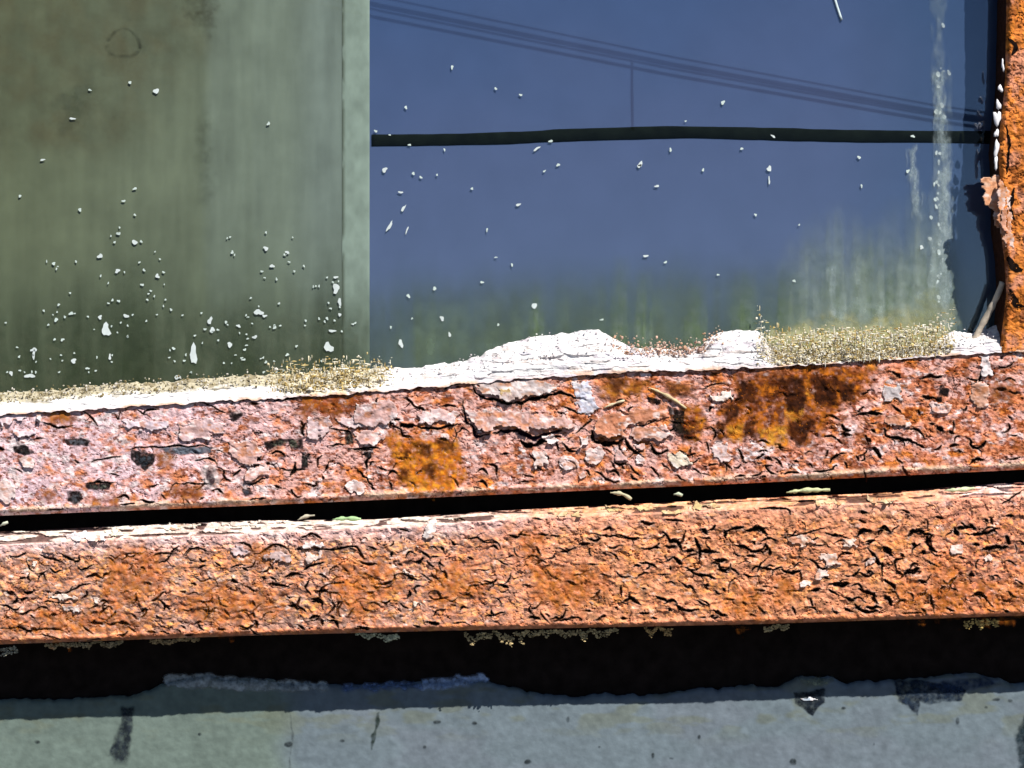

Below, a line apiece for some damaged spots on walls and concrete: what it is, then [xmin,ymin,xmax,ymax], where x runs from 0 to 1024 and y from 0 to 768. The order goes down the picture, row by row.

peeling [980,175,1014,248]
damp [414,314,524,366]
damp [637,310,701,351]
damp [764,273,947,354]
rust [43,411,74,426]
rust [302,391,367,424]
rust [386,432,466,495]
crack [34,362,1020,505]
rust [599,377,646,401]
rust [666,359,878,446]
crack [0,489,1024,641]
damp [110,707,134,760]